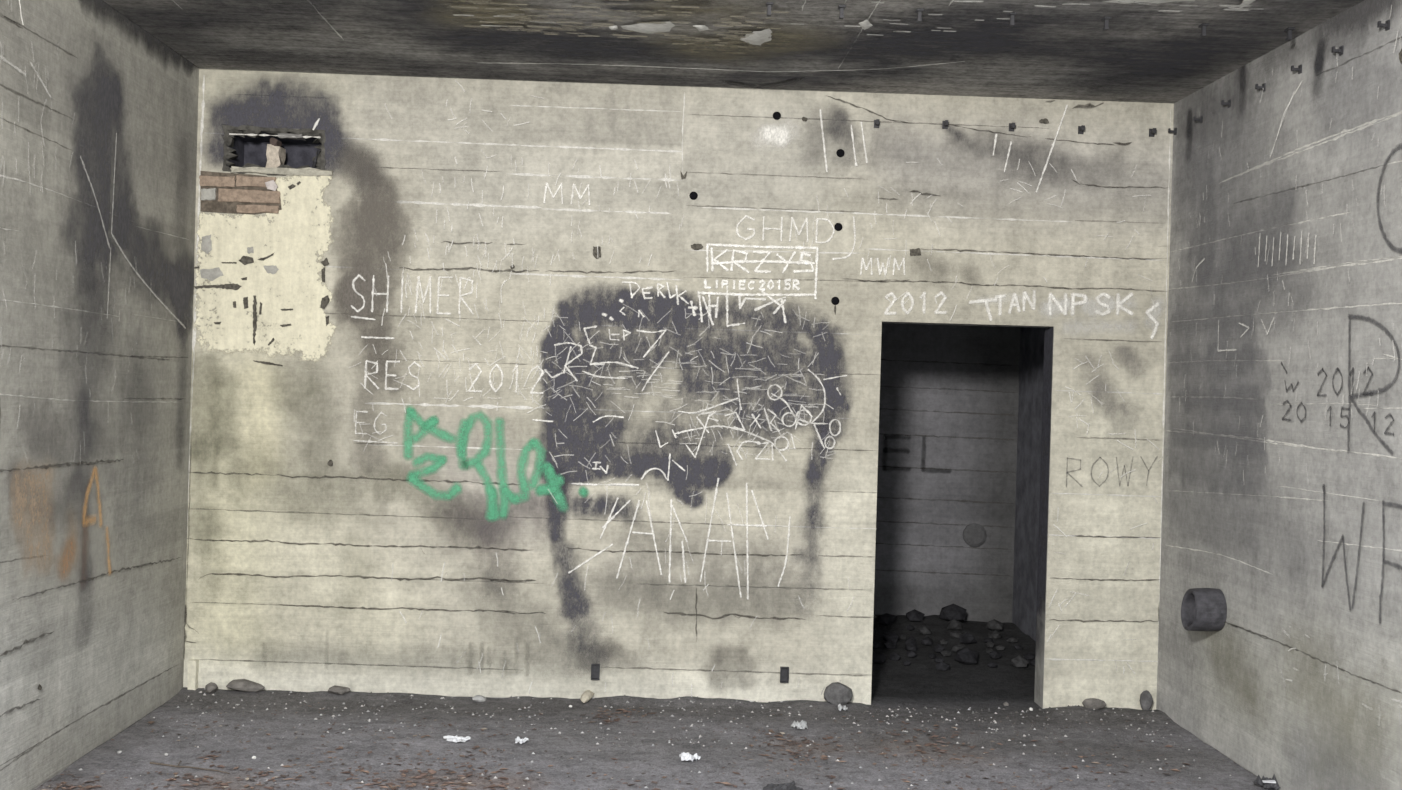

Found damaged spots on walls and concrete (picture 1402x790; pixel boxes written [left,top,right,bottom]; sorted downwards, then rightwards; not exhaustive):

flaking render [194,125,336,366]